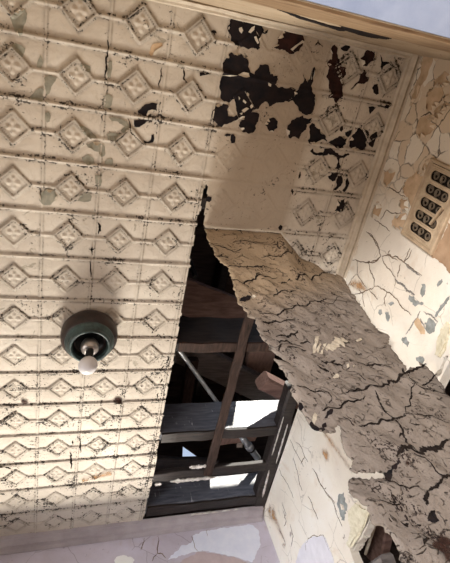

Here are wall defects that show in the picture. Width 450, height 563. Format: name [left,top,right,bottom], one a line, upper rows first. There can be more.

peeling [30,75,57,102]
crack [102,40,110,81]
peeling [227,19,268,50]
peeling [274,31,304,54]
flaking render [277,9,392,40]
peeling [351,50,390,91]
peeling [106,103,157,141]
peeling [211,45,378,192]
peeling [79,125,113,166]
crack [210,210,438,364]
crack [317,360,342,372]
peeling [168,524,261,563]